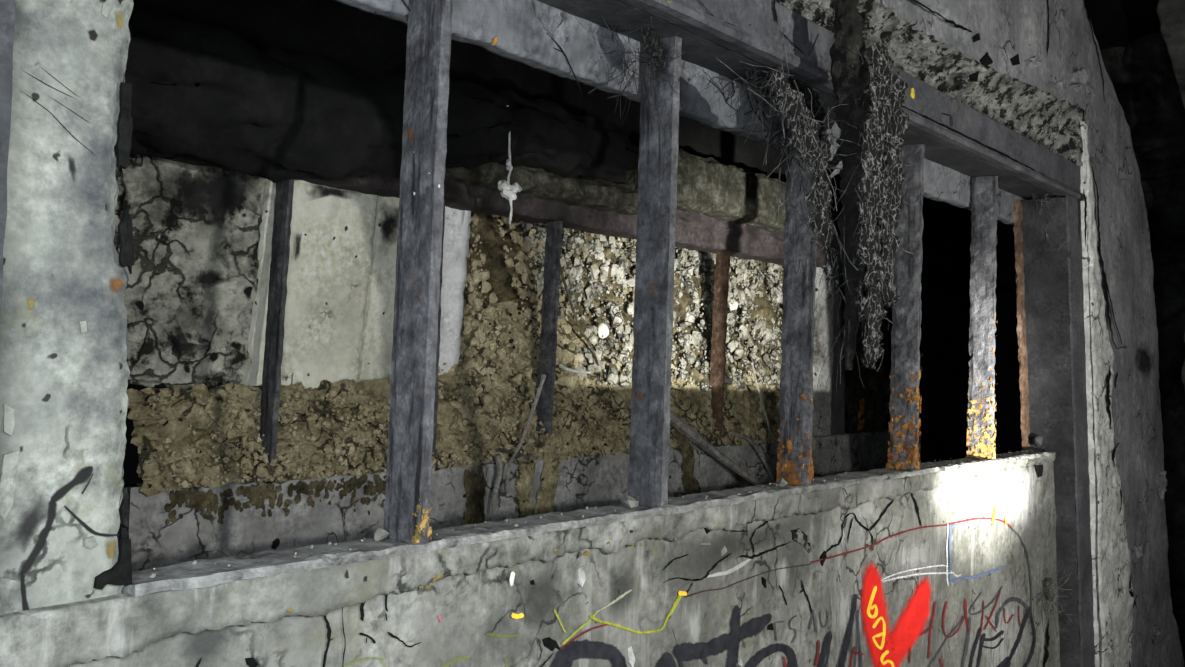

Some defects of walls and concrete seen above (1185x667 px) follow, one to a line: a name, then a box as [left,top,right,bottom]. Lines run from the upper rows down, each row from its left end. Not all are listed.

spalling [776,0,836,33]
corrosion [776,420,814,486]
corrosion [888,374,922,470]
corrosion [967,373,996,459]
corrosion [412,509,432,543]
crack [663,521,790,593]
crack [825,493,922,553]
crack [779,579,812,614]